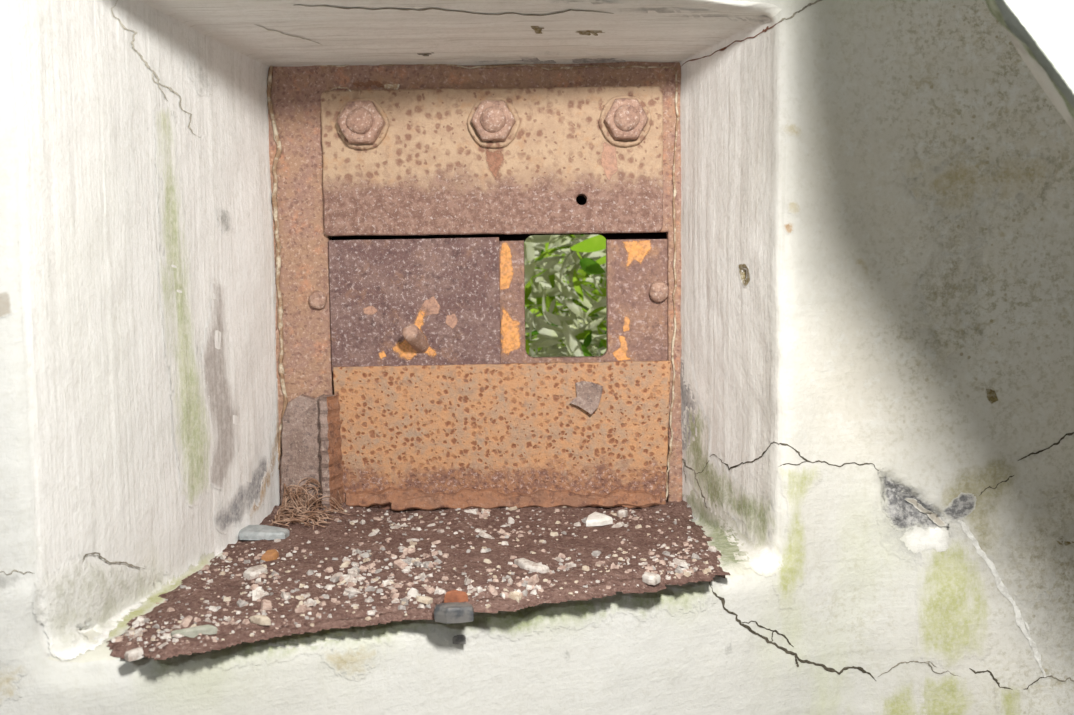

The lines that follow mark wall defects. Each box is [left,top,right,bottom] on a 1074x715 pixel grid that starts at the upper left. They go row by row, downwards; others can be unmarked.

crack [254,24,322,45]
crack [293,5,614,16]
crack [684,0,822,64]
crack [111,1,197,136]
corrosion [486,150,504,178]
corrosion [420,296,458,329]
water stain [213,455,273,534]
crack [682,442,881,508]
spalling [872,467,977,567]
crack [979,432,1074,496]
water stain [934,452,1074,677]
crack [709,581,1074,690]